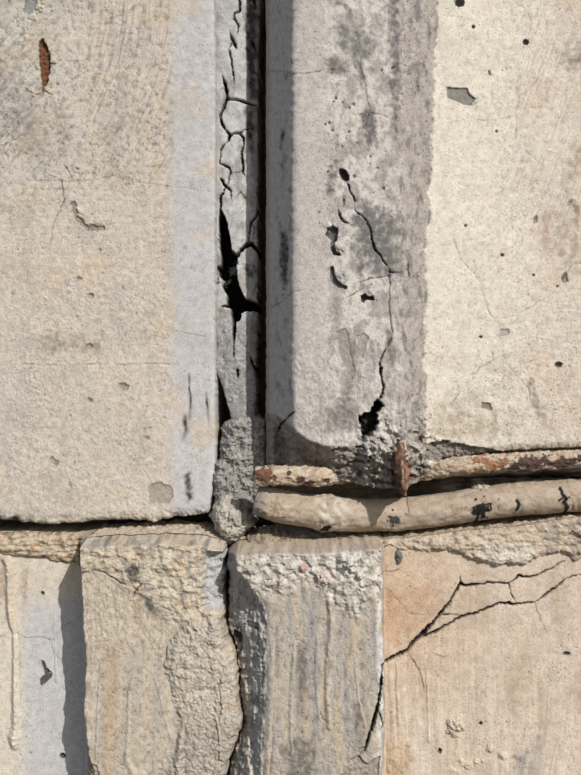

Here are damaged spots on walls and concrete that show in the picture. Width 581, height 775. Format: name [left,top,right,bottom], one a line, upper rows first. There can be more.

crack [219,0,261,240]
peeling [447,87,480,105]
crack [339,184,409,278]
crack [378,311,392,400]
rust [254,465,277,483]
rust [287,468,330,485]
rust [471,453,581,473]
crack [361,561,581,752]